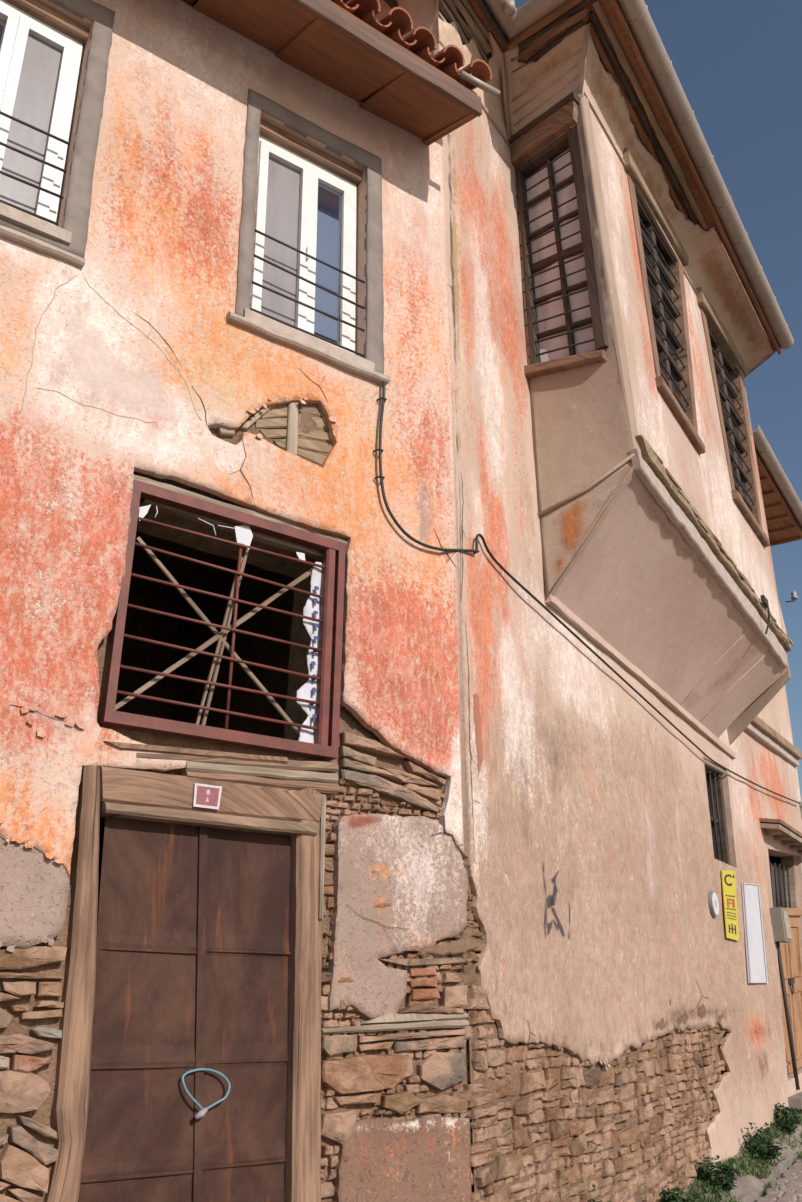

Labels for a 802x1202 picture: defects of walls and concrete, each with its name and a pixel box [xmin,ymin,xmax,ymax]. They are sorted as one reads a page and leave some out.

crack [134,312,208,424]
peeling [0,817,70,953]
spalling [656,1004,726,1029]